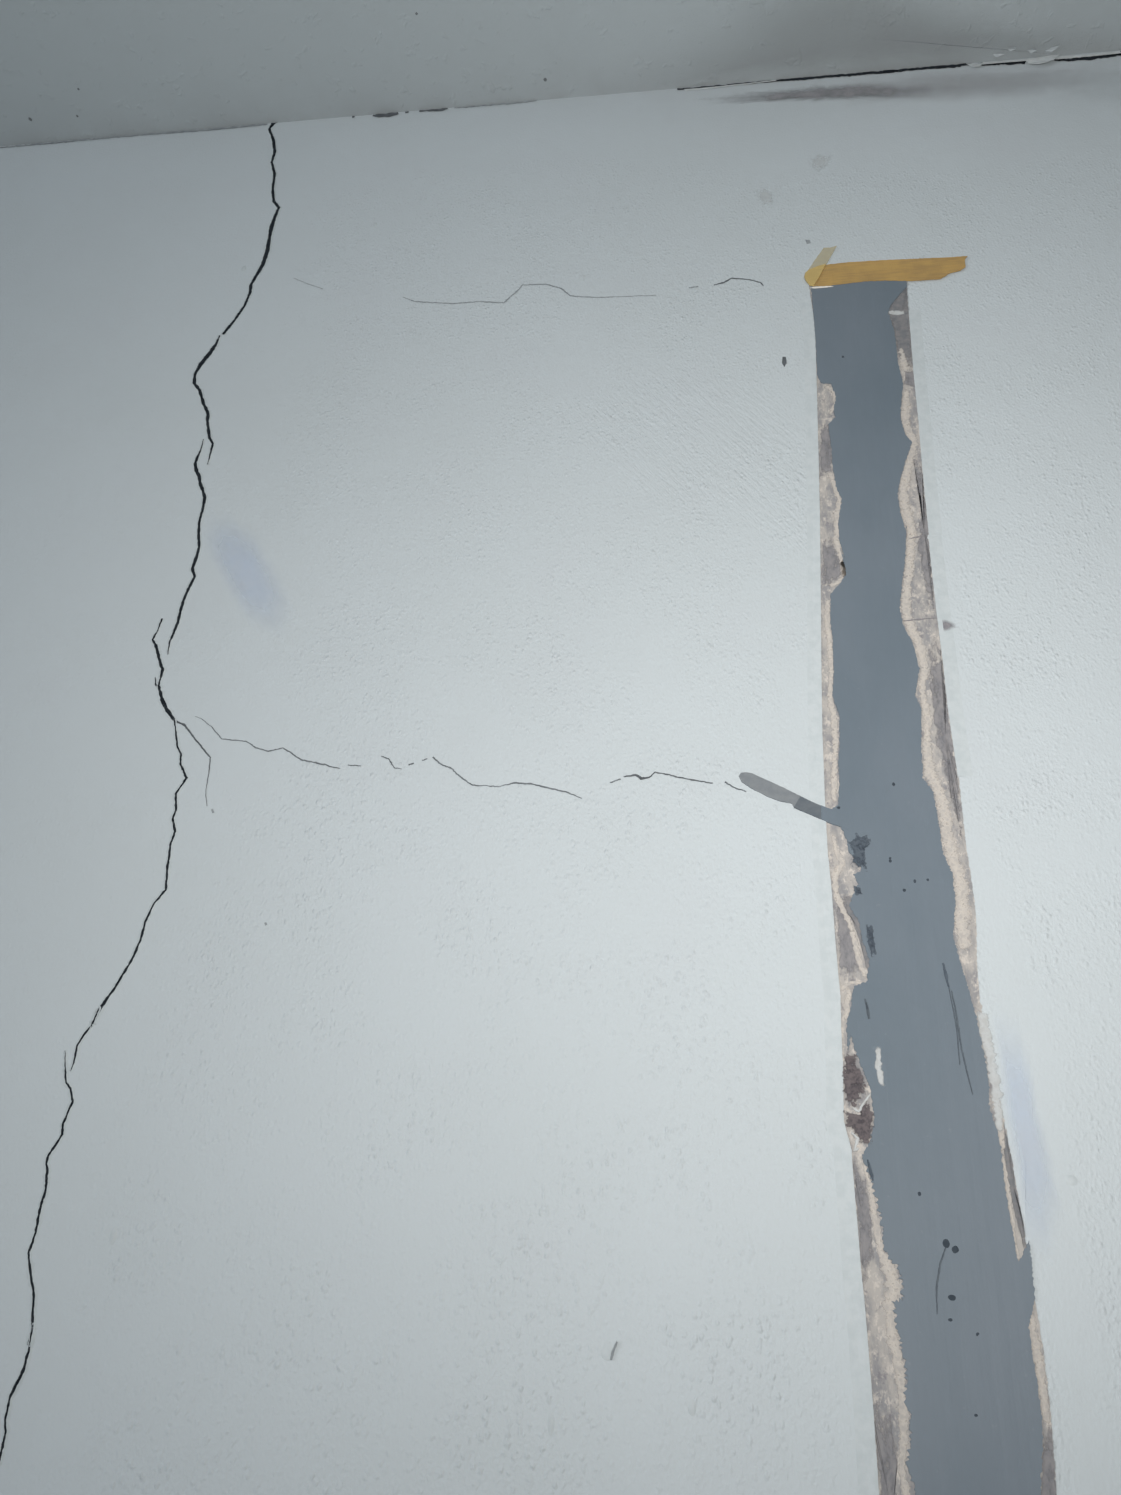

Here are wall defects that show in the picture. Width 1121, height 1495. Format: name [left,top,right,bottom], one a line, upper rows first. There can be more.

crack [352,100,536,118]
crack [677,44,1121,91]
crack [689,278,764,288]
crack [0,122,746,1466]
peeling [782,285,915,1495]
peeling [888,288,1027,1261]
peeling [1028,1300,1057,1495]